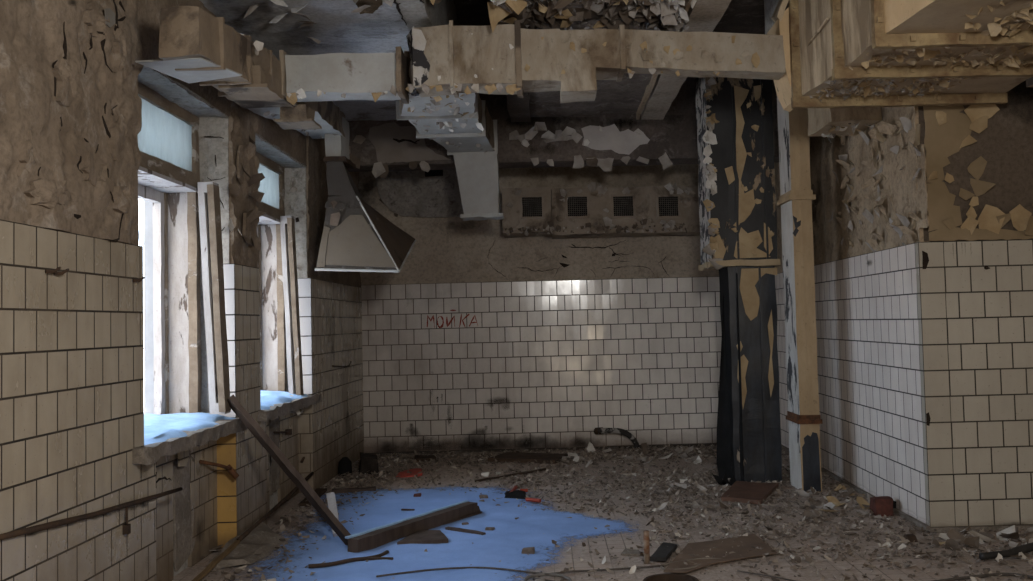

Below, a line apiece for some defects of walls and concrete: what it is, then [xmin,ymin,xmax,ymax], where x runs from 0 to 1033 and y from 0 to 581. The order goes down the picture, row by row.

peeling [244,0,321,44]
flaking render [351,0,394,14]
peeling [487,0,697,53]
crack [53,0,126,242]
peeling [228,136,266,247]
peeling [509,122,673,172]
peeling [702,72,745,270]
peeling [821,104,1033,269]